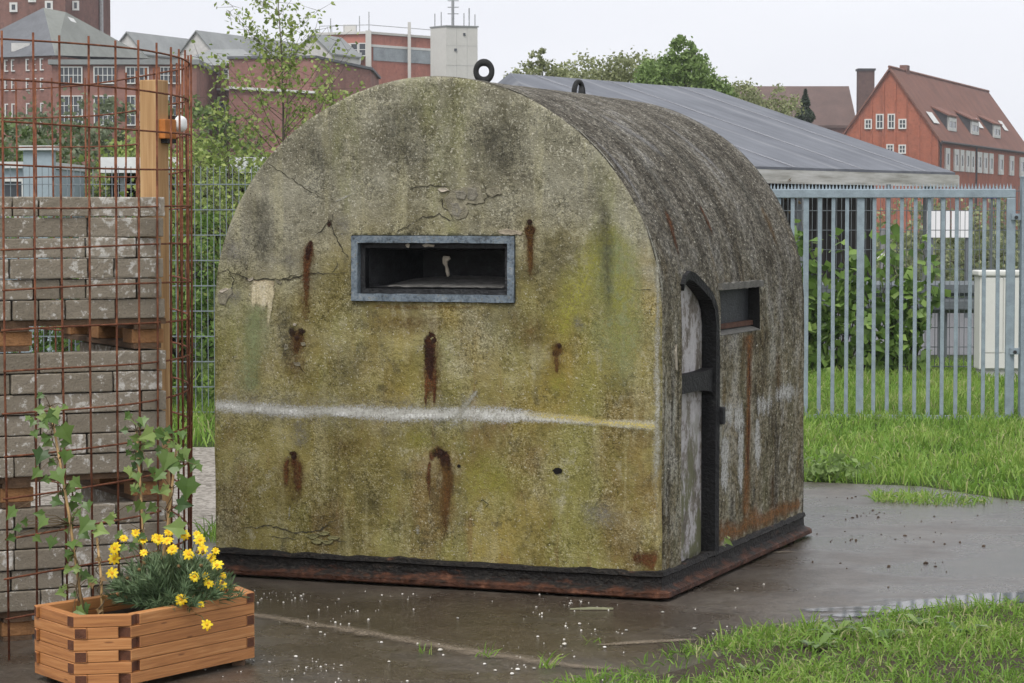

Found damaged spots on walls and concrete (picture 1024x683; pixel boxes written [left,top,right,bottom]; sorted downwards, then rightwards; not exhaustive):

crack [215,158,348,289]
spalling [397,180,502,232]
corrosion [524,219,535,272]
corrosion [284,223,328,373]
corrosion [424,332,438,404]
corrosion [552,343,562,372]
corrosion [284,451,302,493]
corrosion [426,446,453,536]
corrosion [720,335,800,542]
corrosion [633,552,658,570]